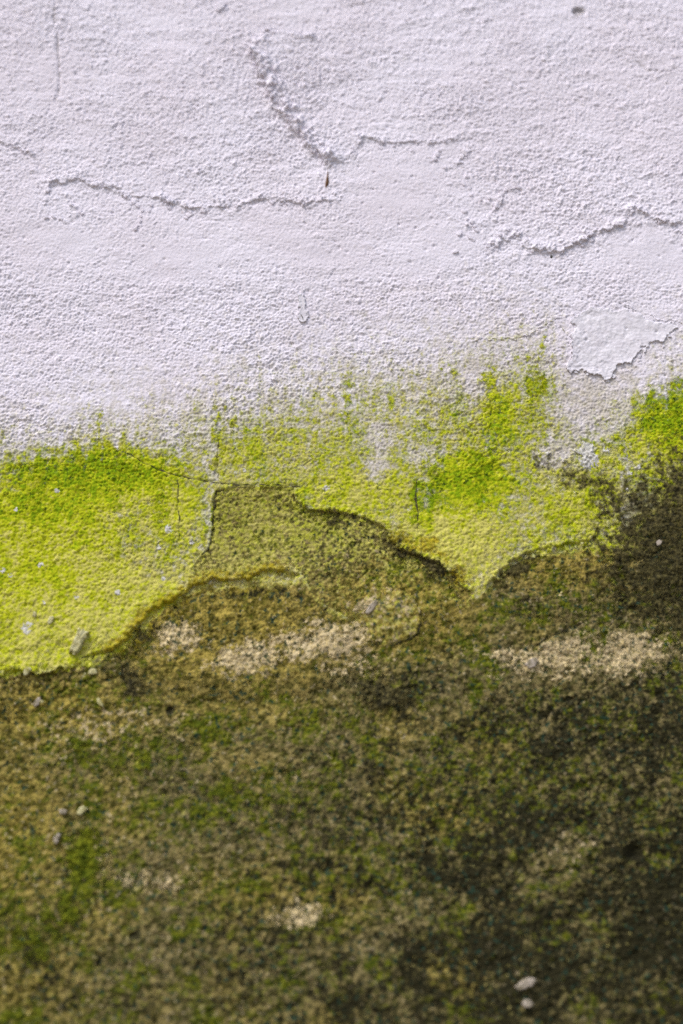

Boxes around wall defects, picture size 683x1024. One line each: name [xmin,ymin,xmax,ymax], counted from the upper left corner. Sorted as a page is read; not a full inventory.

crack [53,6,112,99]
water stain [480,365,499,414]
water stain [521,335,547,422]
peeling [471,306,683,382]
water stain [206,398,238,469]
crack [115,440,302,555]
water stain [409,465,442,524]
water stain [533,377,683,638]
water stain [313,508,463,595]
water stain [499,554,540,607]
water stain [121,660,145,702]
water stain [330,672,414,716]